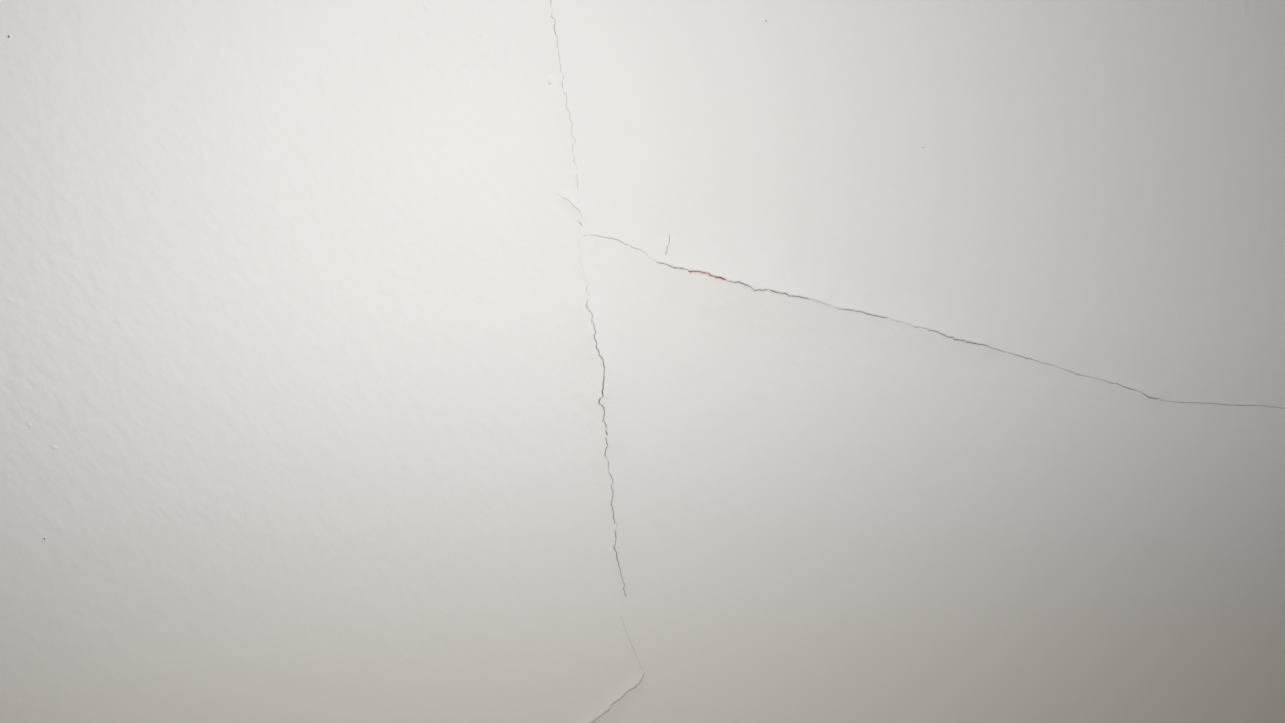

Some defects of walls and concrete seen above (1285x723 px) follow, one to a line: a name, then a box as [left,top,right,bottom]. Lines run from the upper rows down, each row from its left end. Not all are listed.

crack [550,0,1285,723]